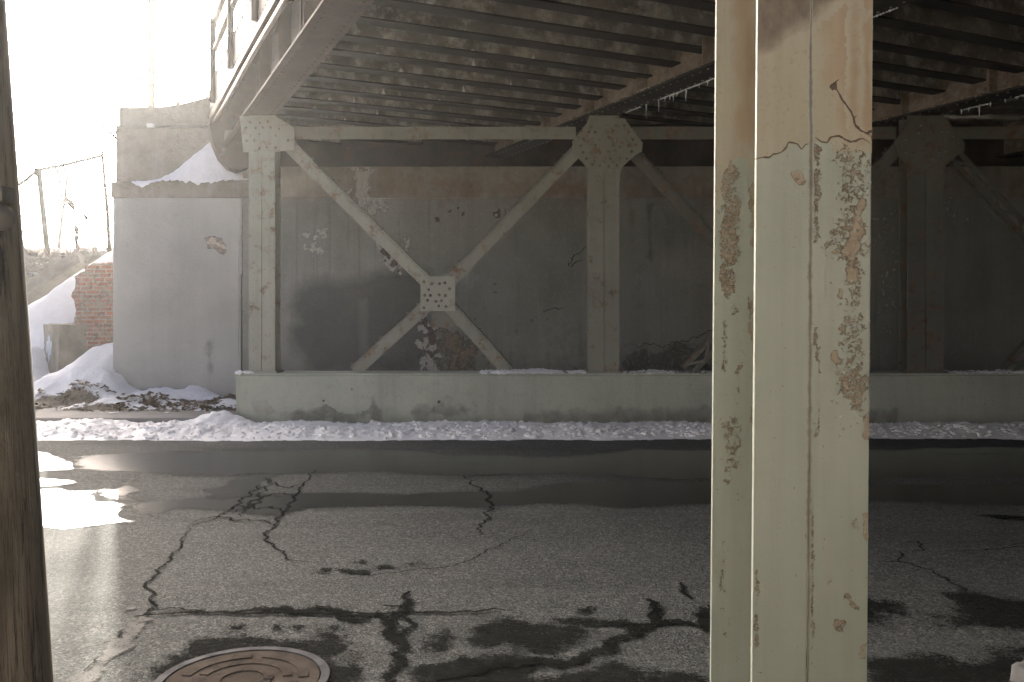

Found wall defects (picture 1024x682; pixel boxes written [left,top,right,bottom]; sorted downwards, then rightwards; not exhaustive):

crack [829,79,874,140]
peeling [622,163,755,393]
peeling [754,135,872,440]
spalling [414,315,477,371]
water stain [407,391,484,422]
water stain [518,401,712,424]
peeling [720,406,753,485]
water stain [869,401,903,424]
crack [70,471,525,682]
crack [434,582,710,680]